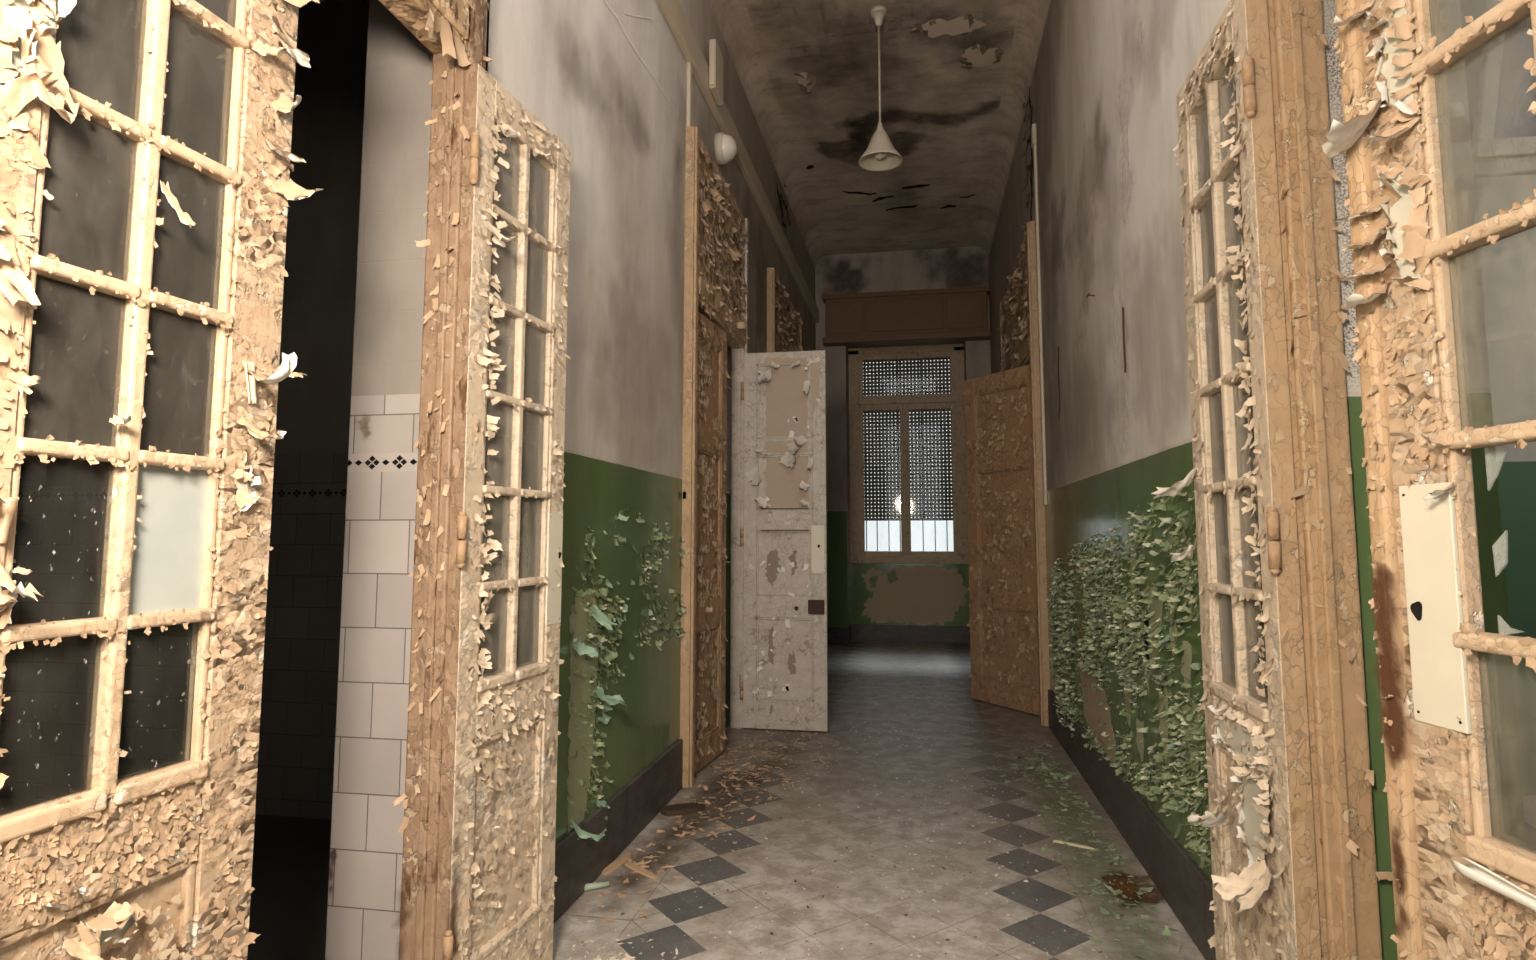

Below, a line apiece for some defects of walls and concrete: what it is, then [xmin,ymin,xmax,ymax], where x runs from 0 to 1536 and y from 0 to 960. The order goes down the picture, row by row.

leakage [820,102,997,159]
peeling [415,239,460,329]
peeling [414,464,455,541]
peeling [423,0,825,960]
peeling [407,561,445,583]
peeling [392,609,446,873]
peeling [1355,693,1405,856]
peeling [1319,838,1407,898]